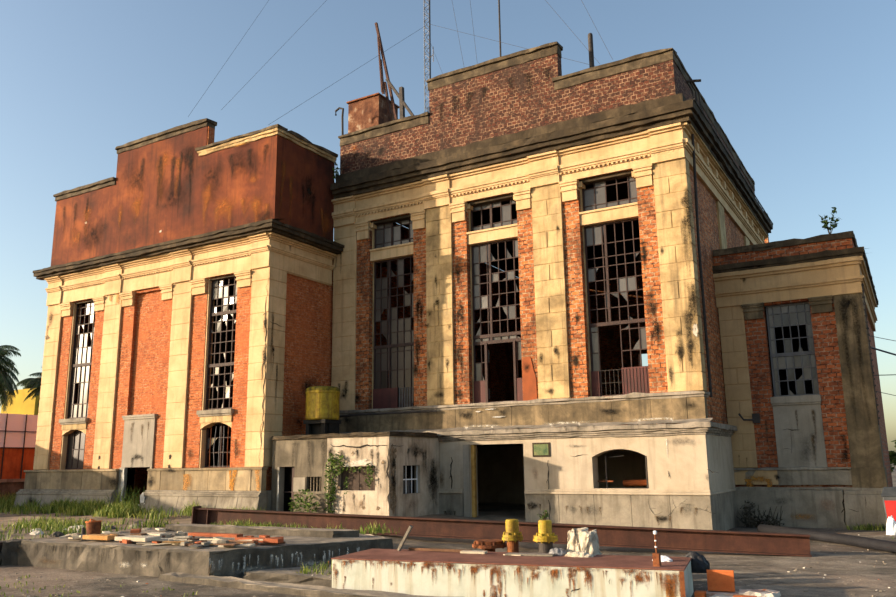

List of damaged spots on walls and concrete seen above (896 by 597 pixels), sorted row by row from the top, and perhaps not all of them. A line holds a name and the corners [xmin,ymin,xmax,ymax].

leakage [682,189,693,243]
crack [259,284,282,462]
leakage [676,285,699,359]
leakage [840,299,863,378]
rust [328,560,592,597]